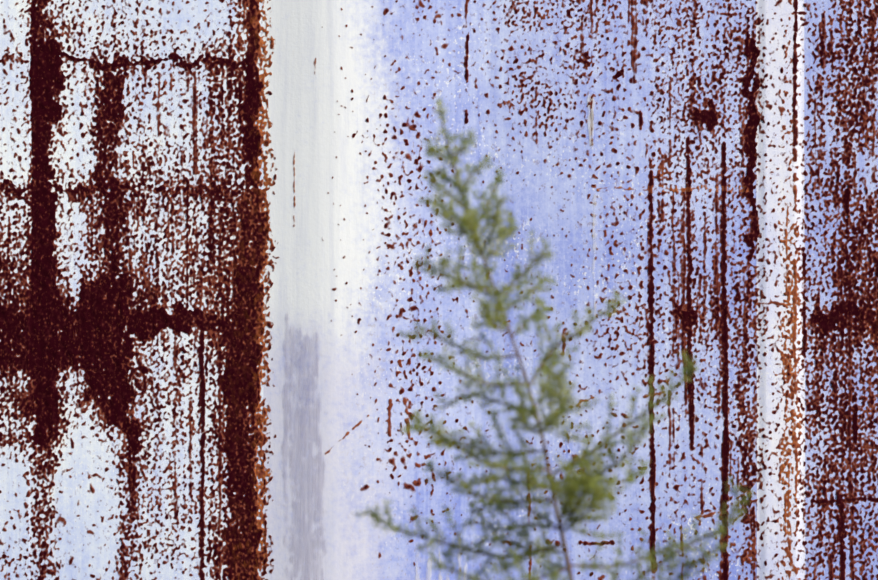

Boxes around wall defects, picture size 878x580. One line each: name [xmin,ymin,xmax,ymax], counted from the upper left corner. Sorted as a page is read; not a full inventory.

rust [0,0,279,580]
rust [352,55,468,497]
rust [413,0,878,580]